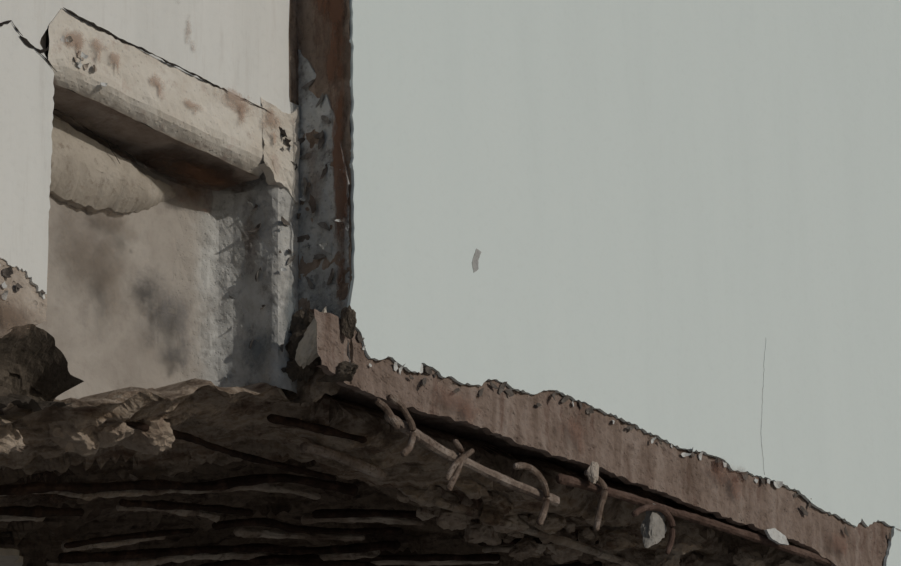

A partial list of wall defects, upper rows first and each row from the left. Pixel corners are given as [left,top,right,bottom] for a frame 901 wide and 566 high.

crack [0,20,57,72]
rust [314,0,347,243]
spalling [0,259,84,412]
peeling [267,49,893,566]
spalling [125,421,149,431]
spalling [0,429,424,542]
spalling [46,518,645,566]